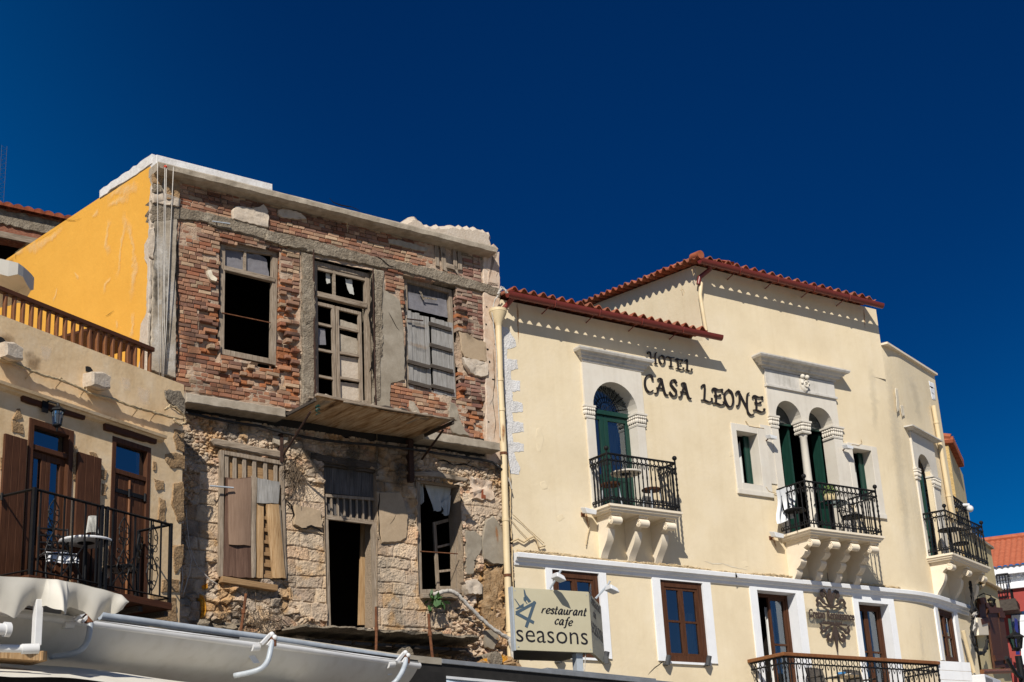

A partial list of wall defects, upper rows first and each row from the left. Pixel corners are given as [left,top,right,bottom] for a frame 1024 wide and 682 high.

spalling [151,173,180,207]
spalling [147,227,168,273]
spalling [301,279,316,324]
peeling [153,323,174,367]
spalling [360,271,383,405]
spalling [468,476,495,501]